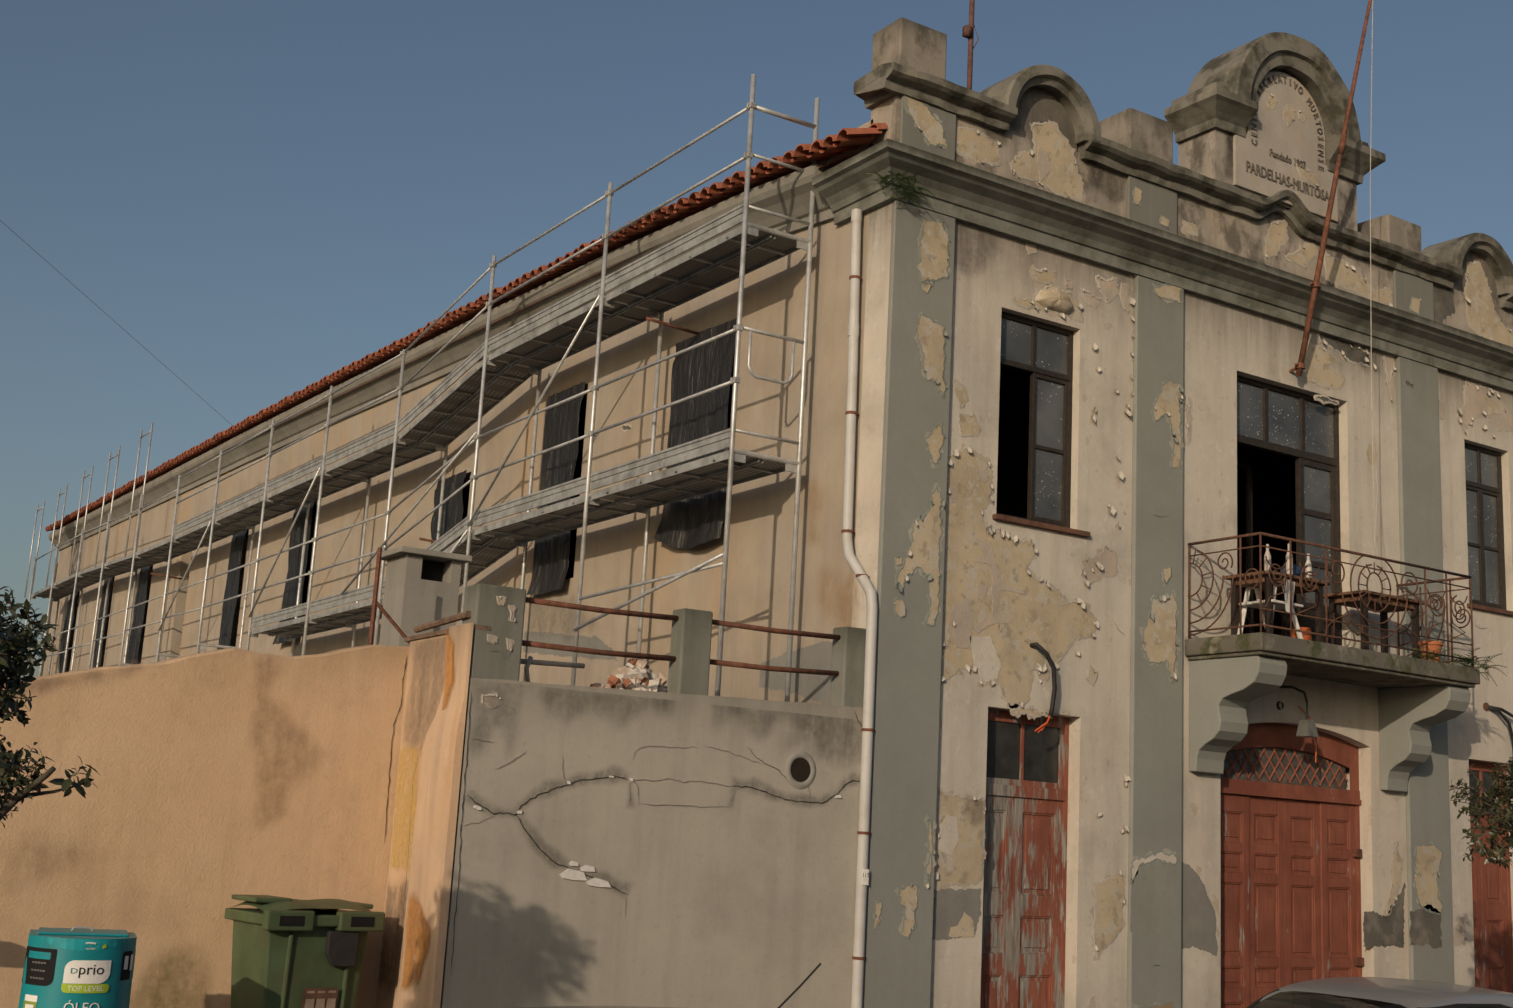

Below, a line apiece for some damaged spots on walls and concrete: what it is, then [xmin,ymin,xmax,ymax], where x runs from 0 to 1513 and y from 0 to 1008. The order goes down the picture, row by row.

peeling [904,95,1084,202]
peeling [916,217,951,294]
peeling [1152,283,1183,305]
peeling [1463,261,1513,347]
peeling [1151,379,1193,472]
peeling [1439,380,1513,440]
peeling [893,311,1119,720]
crack [384,658,418,986]
crack [451,695,859,973]
peeling [873,787,987,940]
peeling [1089,848,1178,961]
peeling [1383,841,1466,947]